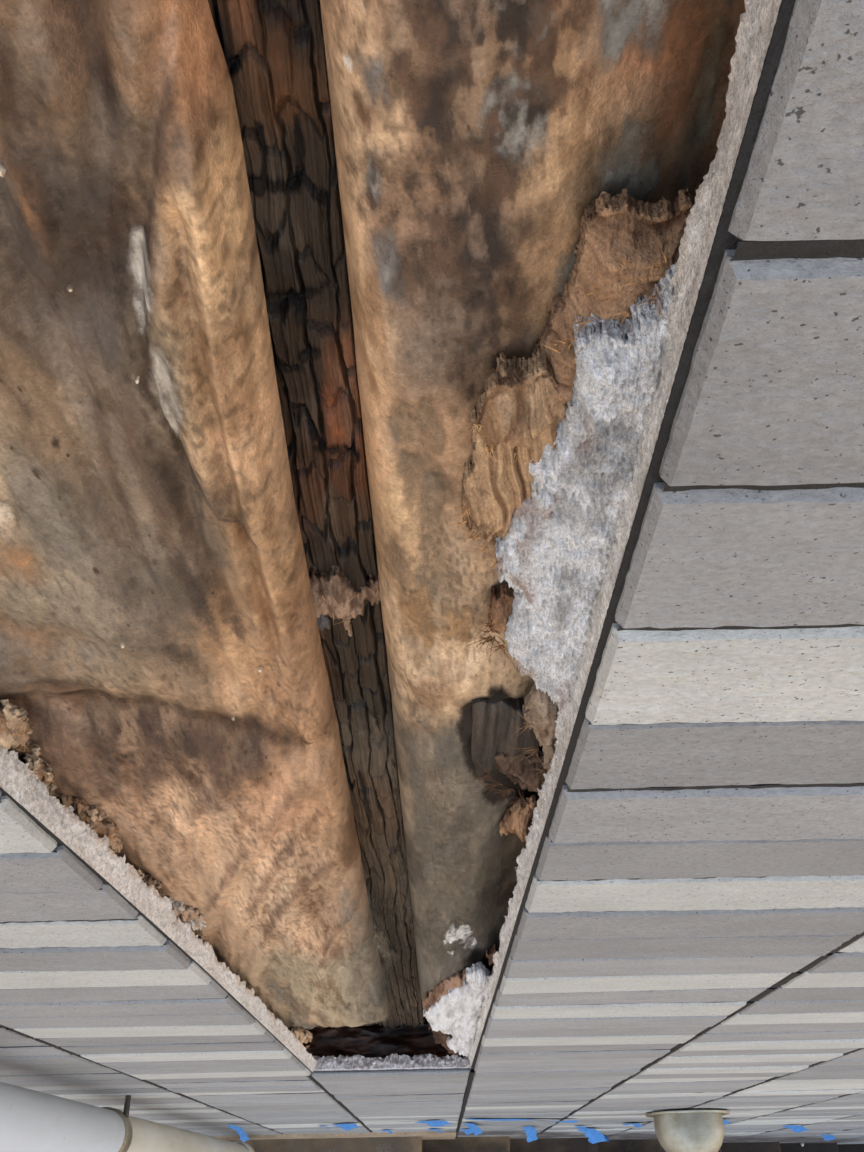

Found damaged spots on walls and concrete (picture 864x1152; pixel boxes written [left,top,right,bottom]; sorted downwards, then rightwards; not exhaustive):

peeling [598,0,681,61]
peeling [362,62,381,98]
peeling [482,68,548,162]
damp [356,154,422,223]
damp [382,0,593,400]
peeling [603,121,664,203]
peeling [372,229,404,302]
peeling [558,247,578,293]
spalling [495,262,676,714]
damp [15,680,235,796]
spalling [422,962,501,1060]